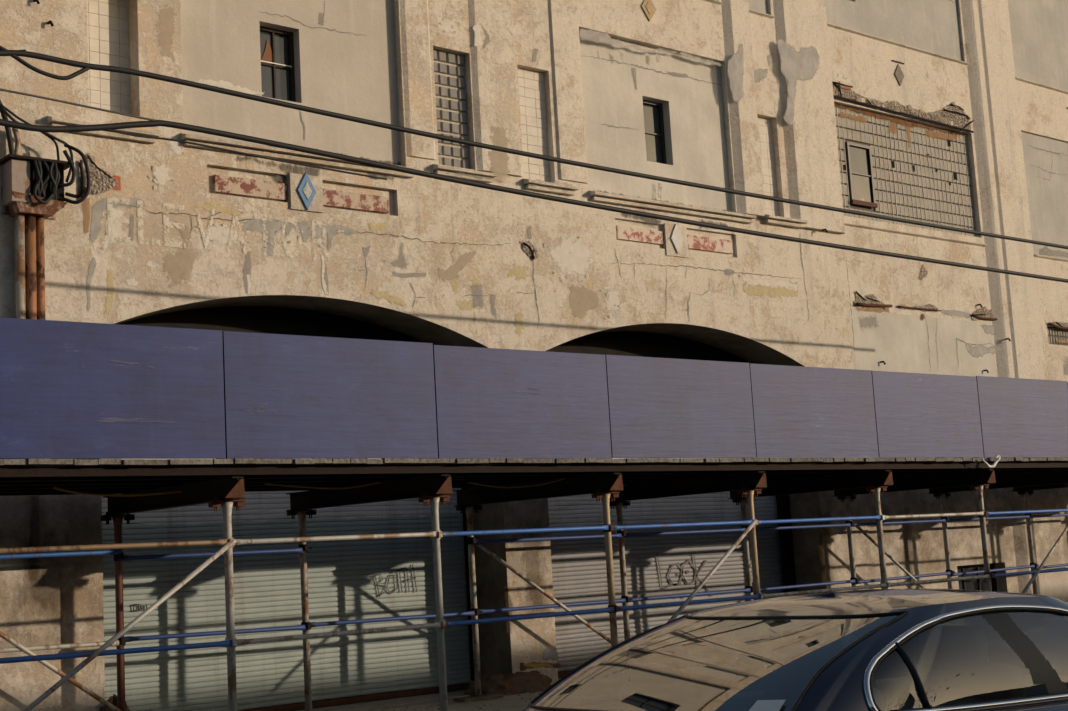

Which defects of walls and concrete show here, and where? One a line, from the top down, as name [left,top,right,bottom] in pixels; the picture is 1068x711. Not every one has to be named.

crack [263,0,366,36]
spalling [832,81,974,136]
peeling [146,202,386,286]
peeling [438,251,477,324]
peeling [508,227,621,318]
spalling [854,291,941,320]
spalling [971,306,998,321]
spalling [1048,321,1068,343]